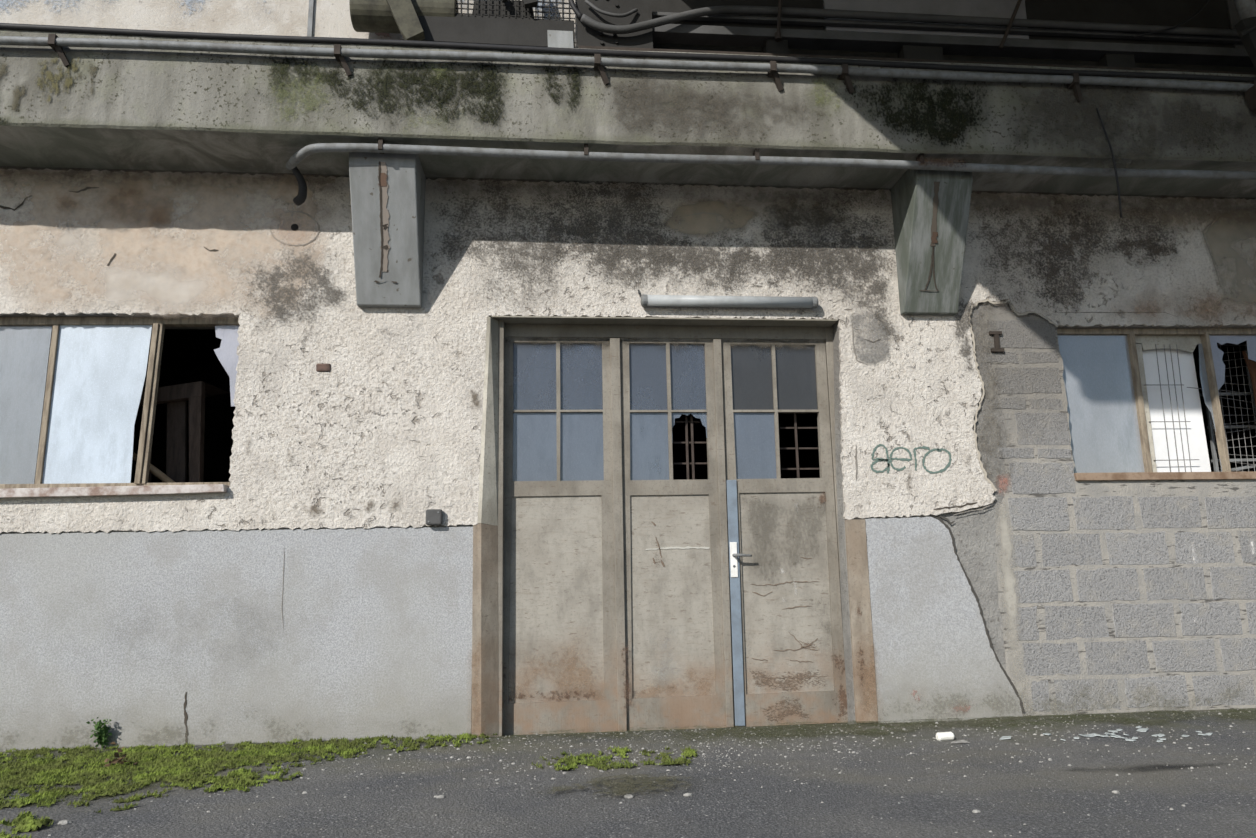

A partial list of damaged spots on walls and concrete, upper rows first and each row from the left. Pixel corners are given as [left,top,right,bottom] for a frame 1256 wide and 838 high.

crack [0,195,32,211]
water stain [248,255,345,327]
water stain [435,178,896,339]
water stain [955,299,974,369]
water stain [969,191,1256,312]
flaking render [929,299,1059,516]
spalling [1149,344,1201,472]
crack [934,515,1025,713]